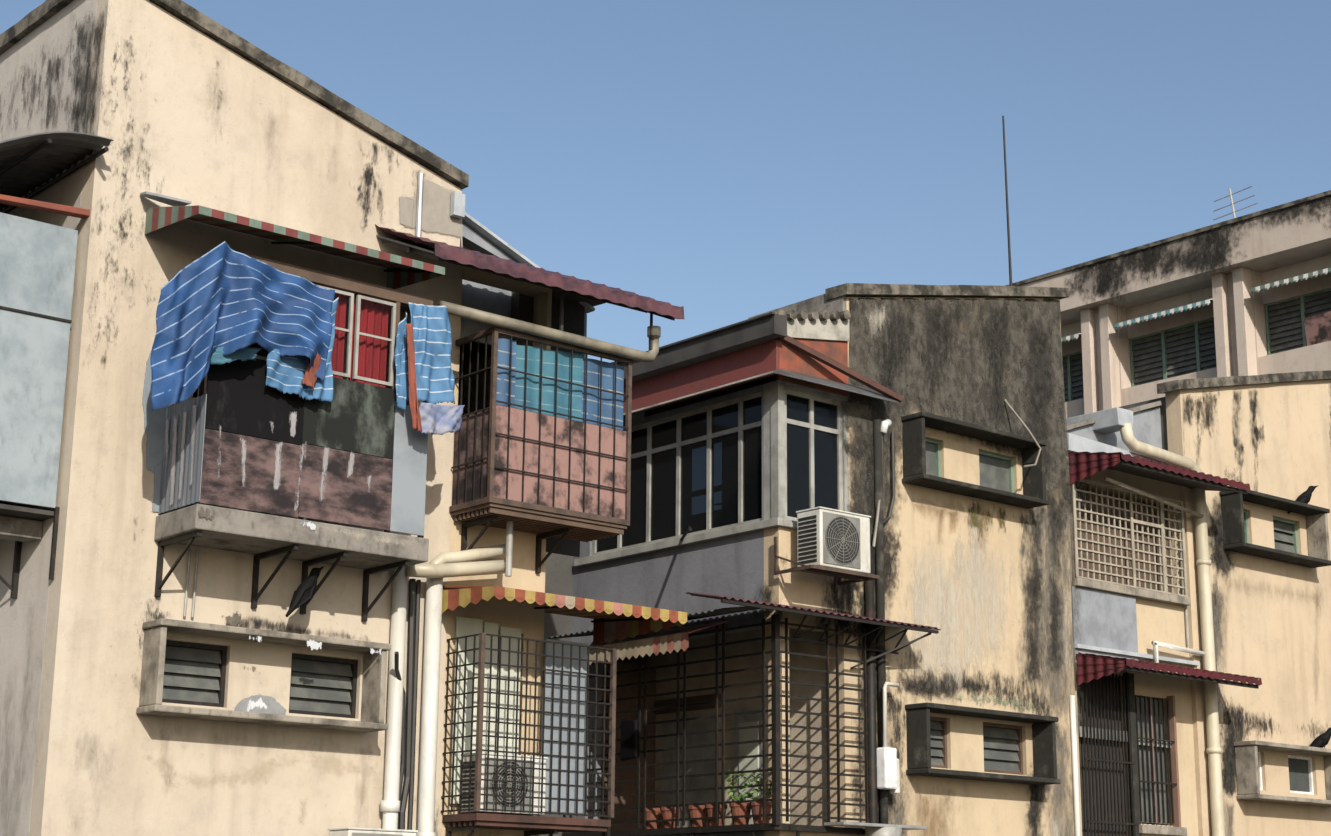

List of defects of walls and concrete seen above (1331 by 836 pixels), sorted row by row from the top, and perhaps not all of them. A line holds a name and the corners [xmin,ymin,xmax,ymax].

leakage [46,14,128,133]
leakage [1067,195,1331,301]
leakage [844,308,960,525]
leakage [984,306,1009,424]
leakage [1025,322,1053,473]
leakage [889,504,1047,765]
leakage [1022,498,1067,679]
leakage [1208,501,1234,686]
leakage [1223,710,1241,836]